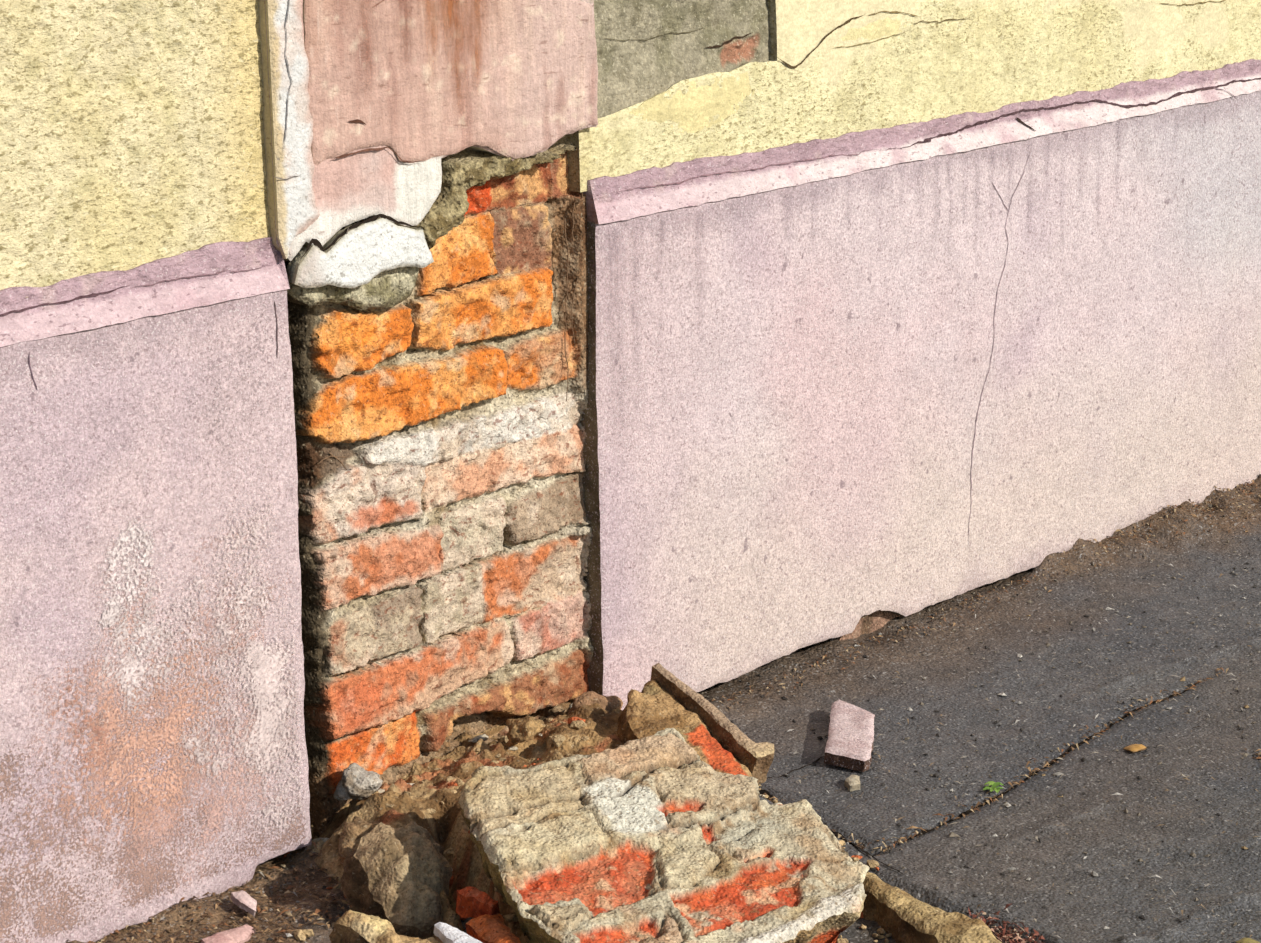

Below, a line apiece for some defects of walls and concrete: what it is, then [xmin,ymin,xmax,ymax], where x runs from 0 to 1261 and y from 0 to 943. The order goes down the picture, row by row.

crack [0,265,266,316]
crack [300,214,414,259]
spalling [284,0,770,837]
crack [777,11,964,68]
crack [616,78,1261,549]
leakage [0,503,305,943]